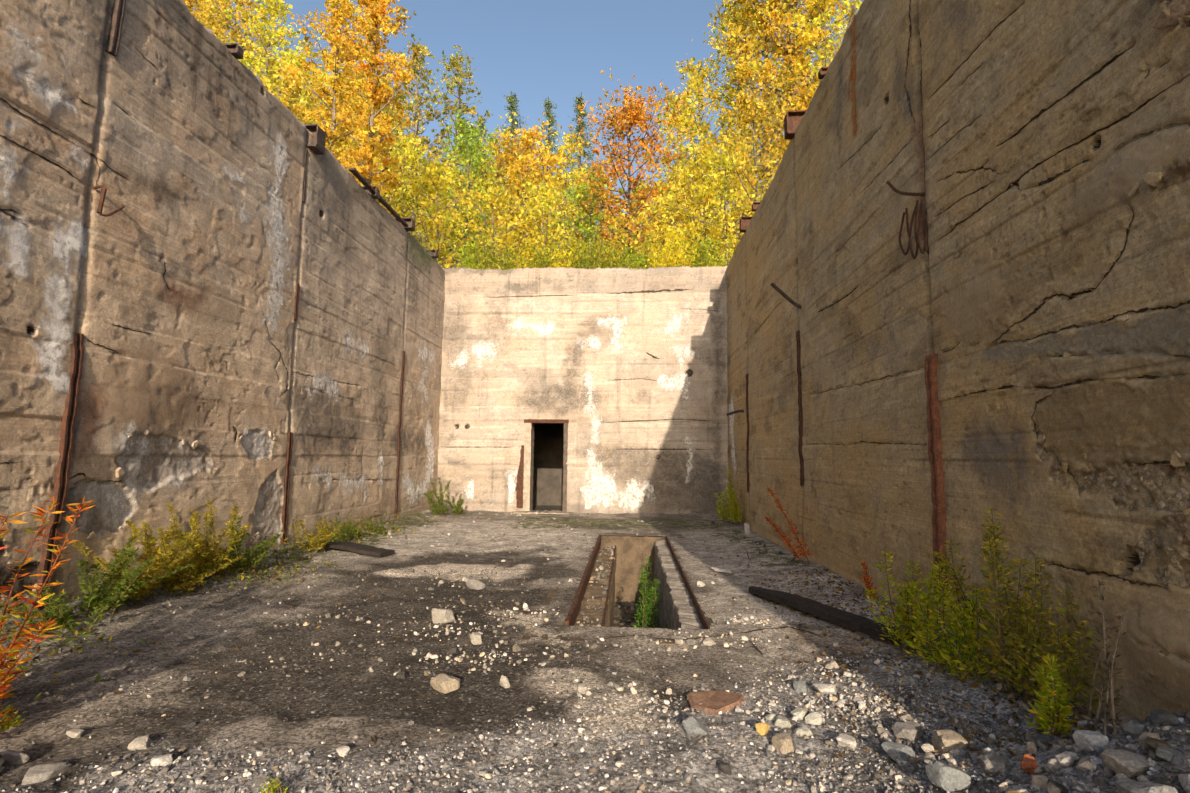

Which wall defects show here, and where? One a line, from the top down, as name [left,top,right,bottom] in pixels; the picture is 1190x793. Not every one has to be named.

efflorescence [34,220,86,392]
crack [0,97,128,185]
efflorescence [261,133,291,339]
damp [525,289,738,514]
corrosion [849,4,857,135]
crack [813,199,1190,494]
spalling [1129,157,1190,198]
spalling [1153,0,1190,31]
peeling [63,430,216,540]
spalling [1034,427,1190,588]